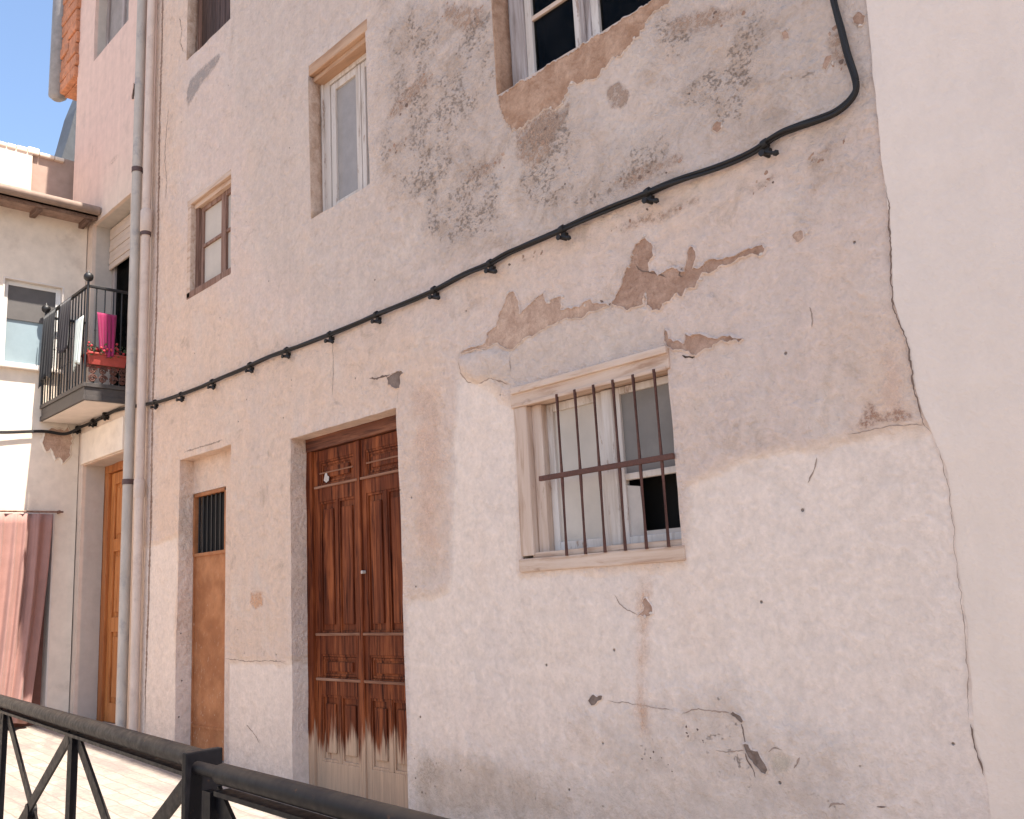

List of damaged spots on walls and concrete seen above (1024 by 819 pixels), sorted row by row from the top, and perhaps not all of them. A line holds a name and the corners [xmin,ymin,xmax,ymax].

spalling [498,0,673,144]
damp [607,83,628,108]
flaking render [461,234,767,358]
spalling [370,369,405,390]
flaking render [40,425,75,464]
crack [885,185,984,775]
flaking render [637,597,654,619]
crack [608,700,800,776]